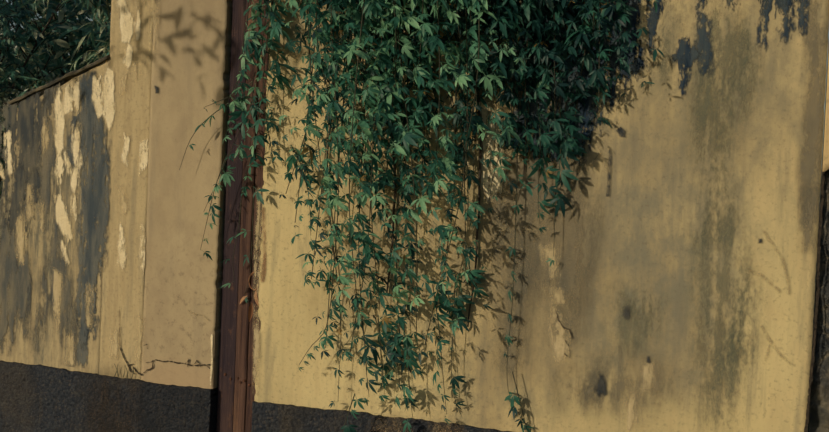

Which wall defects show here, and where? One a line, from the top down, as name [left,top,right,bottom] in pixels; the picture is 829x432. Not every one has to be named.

peeling [0,130,13,179]
peeling [16,185,44,264]
leakage [0,72,111,367]
peeling [42,82,82,264]
peeling [92,68,115,130]
peeling [116,0,159,68]
peeling [480,97,505,201]
leakage [493,0,665,372]
leakage [660,0,748,151]
leakage [757,0,824,249]
crack [119,310,211,376]
leakage [582,365,661,405]